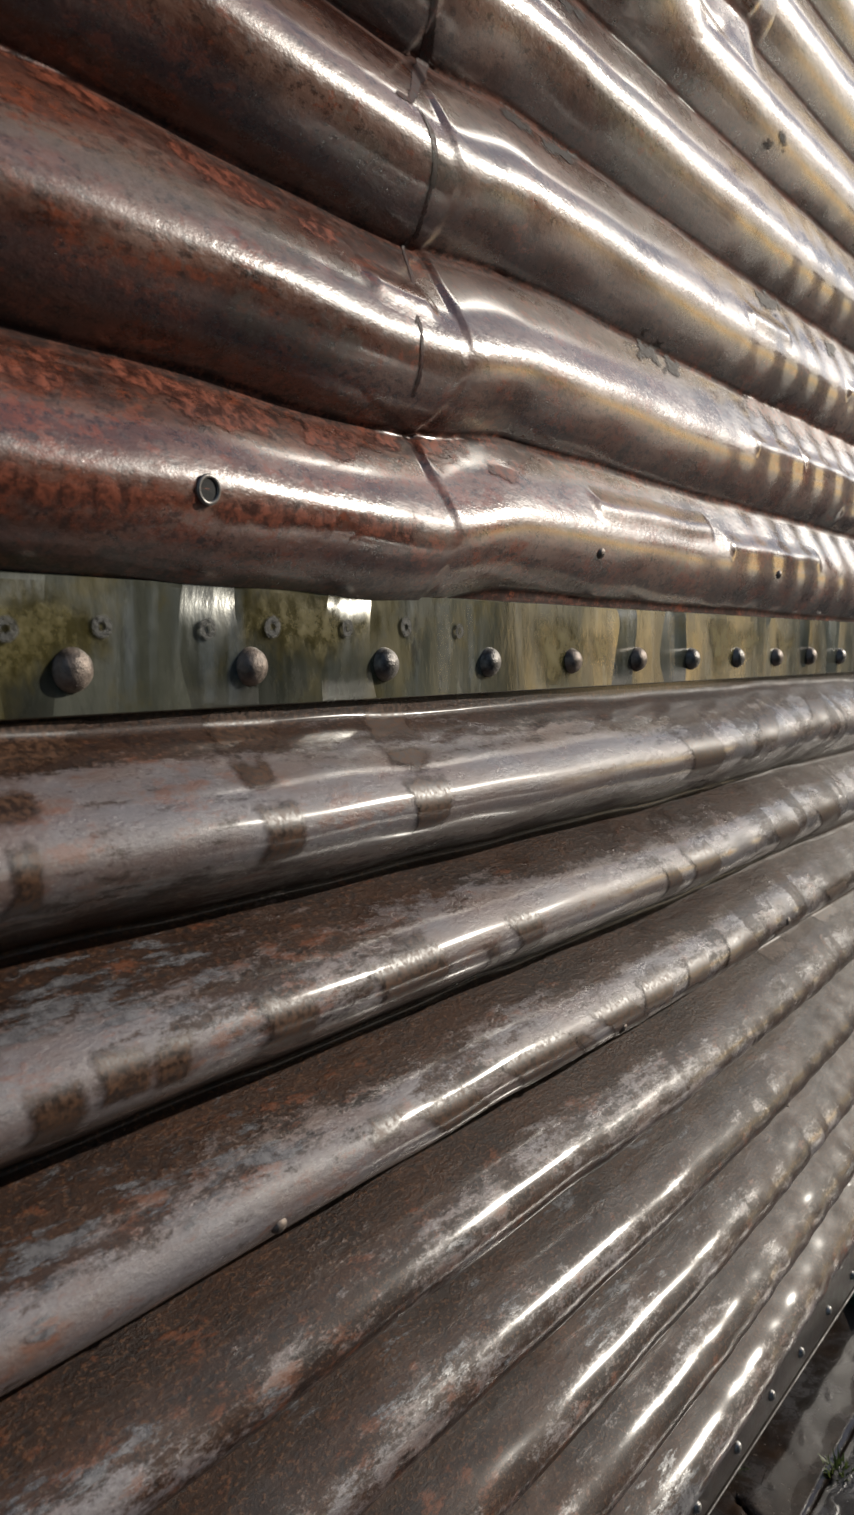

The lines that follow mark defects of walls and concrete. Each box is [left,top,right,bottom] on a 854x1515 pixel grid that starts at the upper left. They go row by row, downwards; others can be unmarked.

crack [396,0,438,398]
corrosion [746,393,854,457]
corrosion [0,450,425,544]
damp [0,615,19,642]
damp [265,616,281,638]
damp [320,596,356,637]
corrosion [205,708,308,868]
peeling [0,933,239,1046]
corrosion [368,880,848,1148]
peeling [0,1217,102,1293]
peeling [0,1424,162,1515]
peeling [632,1449,709,1515]